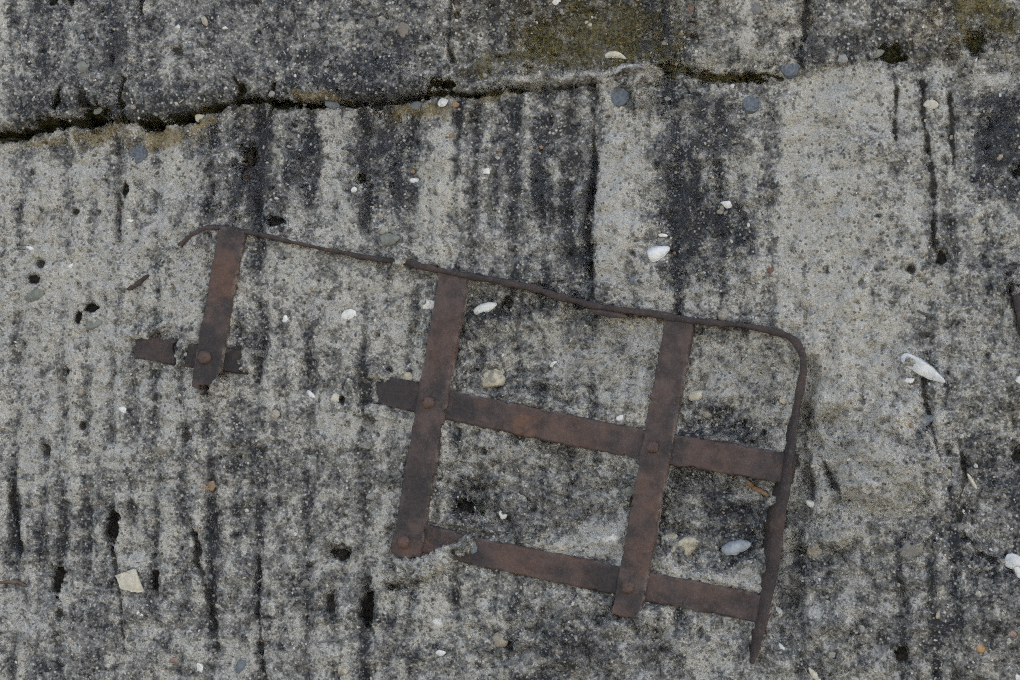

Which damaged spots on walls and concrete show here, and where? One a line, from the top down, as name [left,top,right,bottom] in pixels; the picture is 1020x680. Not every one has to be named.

crack [0,77,363,137]
crack [390,1,532,105]
leakage [487,18,683,102]
leakage [971,74,1013,87]
leakage [145,176,175,194]
leakage [147,207,168,236]